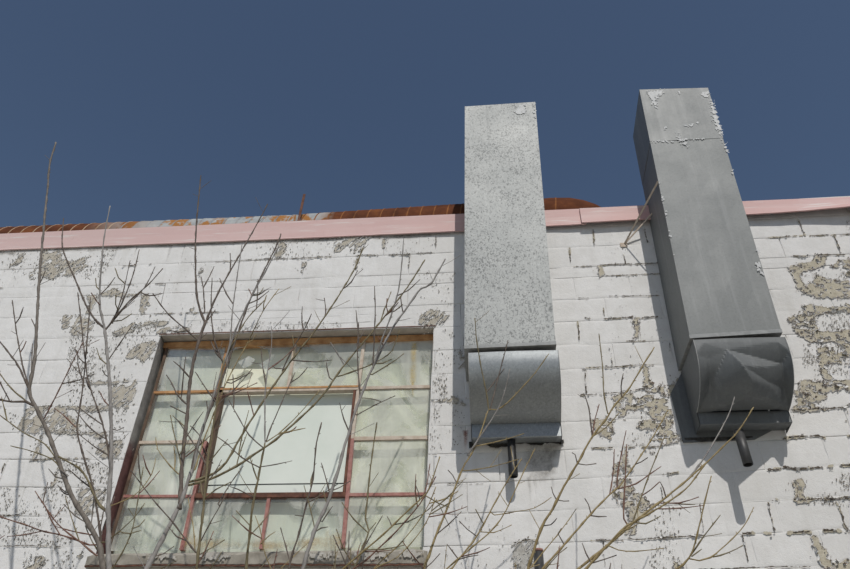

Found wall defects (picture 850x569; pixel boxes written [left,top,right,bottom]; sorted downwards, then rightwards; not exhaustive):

peeling [4,250,92,280]
peeling [60,288,195,364]
peeling [417,309,449,335]
peeling [786,253,850,416]
peeling [12,364,137,462]
peeling [591,365,683,445]
peeling [611,449,655,535]
peeling [788,478,807,504]
spalling [502,534,536,569]
peeling [810,533,850,569]